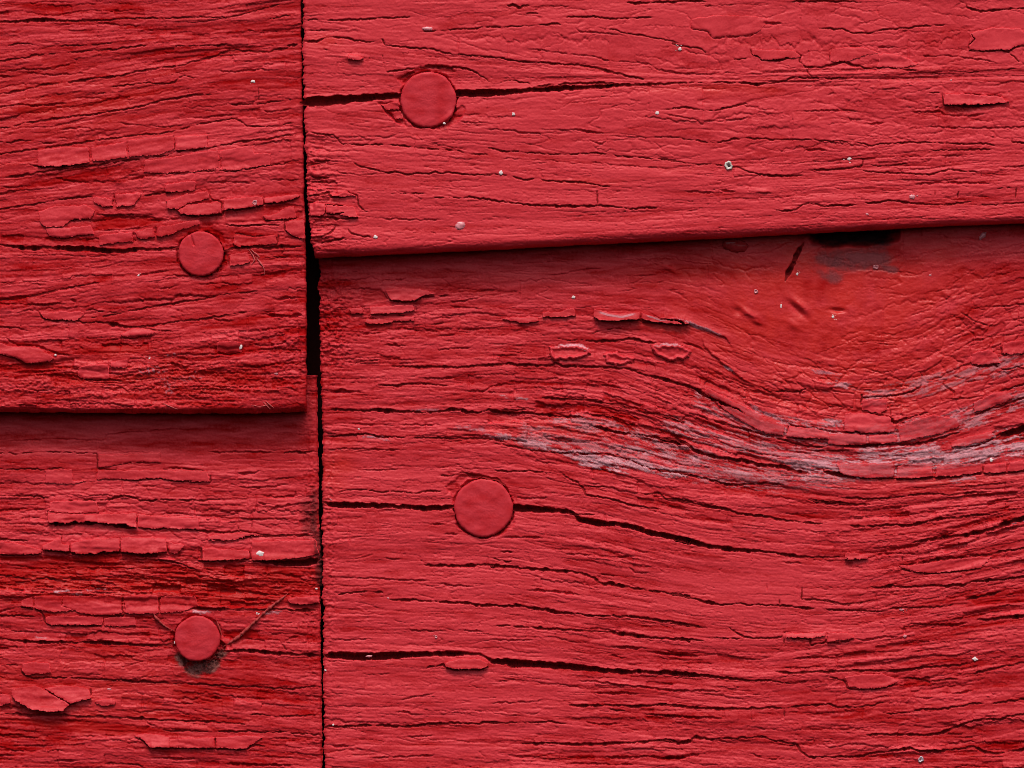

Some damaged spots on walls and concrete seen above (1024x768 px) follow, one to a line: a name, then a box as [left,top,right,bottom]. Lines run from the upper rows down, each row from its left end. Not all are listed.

crack [0,0,1024,264]
peeling [37,134,358,266]
crack [785,242,804,281]
peeling [594,309,689,325]
peeling [704,388,993,447]
crack [284,319,1024,646]
peeling [837,459,1024,478]
peeling [0,501,319,561]
peeling [21,595,199,627]
crack [0,451,1024,768]
peeling [0,662,116,712]
peeling [135,733,262,749]